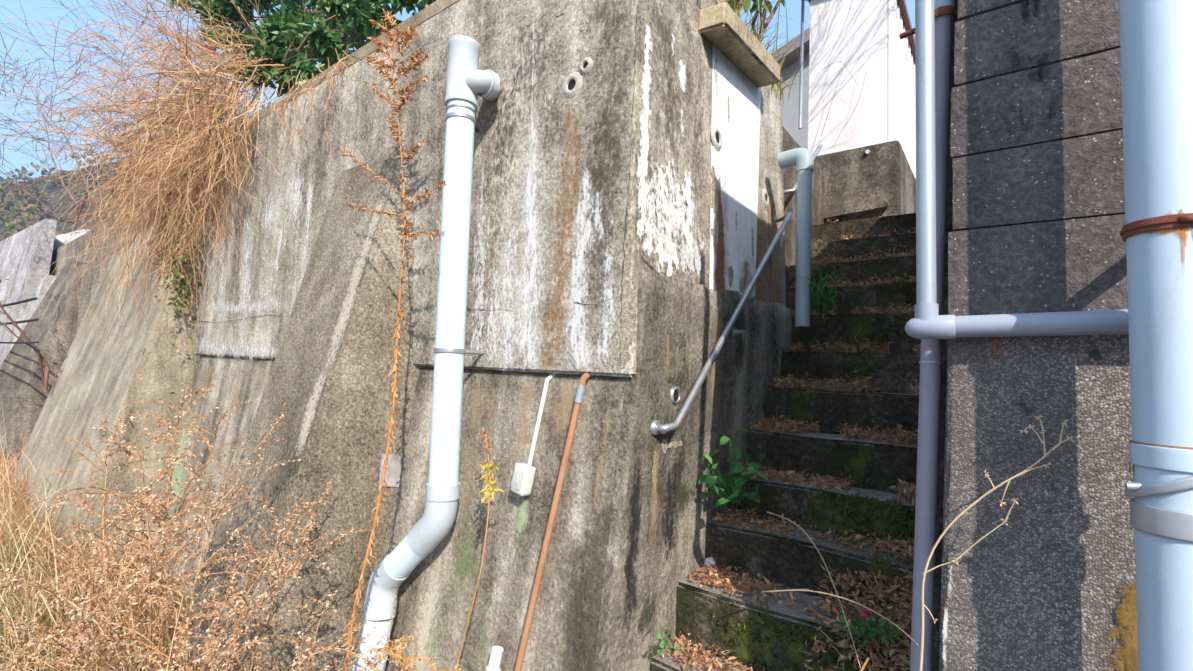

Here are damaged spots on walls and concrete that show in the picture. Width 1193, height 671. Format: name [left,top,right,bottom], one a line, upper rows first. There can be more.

rust [542,106,578,364]
rust [715,180,725,292]
rust [1151,210,1193,262]
water stain [557,452,682,671]